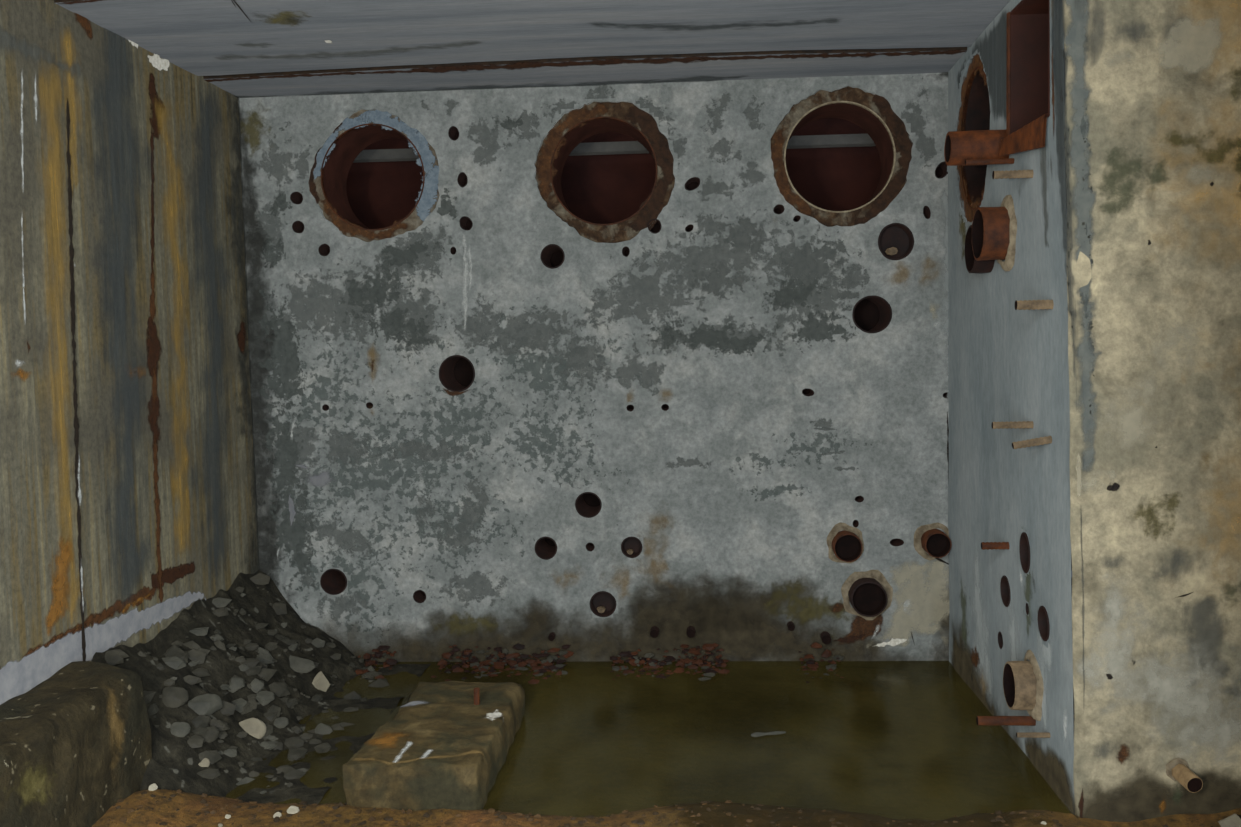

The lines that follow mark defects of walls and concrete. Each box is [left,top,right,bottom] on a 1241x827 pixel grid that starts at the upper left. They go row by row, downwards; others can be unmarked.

damp [224,40,477,59]
damp [593,19,837,30]
damp [958,13,1007,118]
damp [901,89,937,167]
damp [1040,0,1165,471]
corrosion [24,35,195,657]
damp [75,13,147,598]
damp [192,76,914,671]
damp [1136,495,1178,535]
damp [936,559,1241,822]
damp [672,802,1018,827]